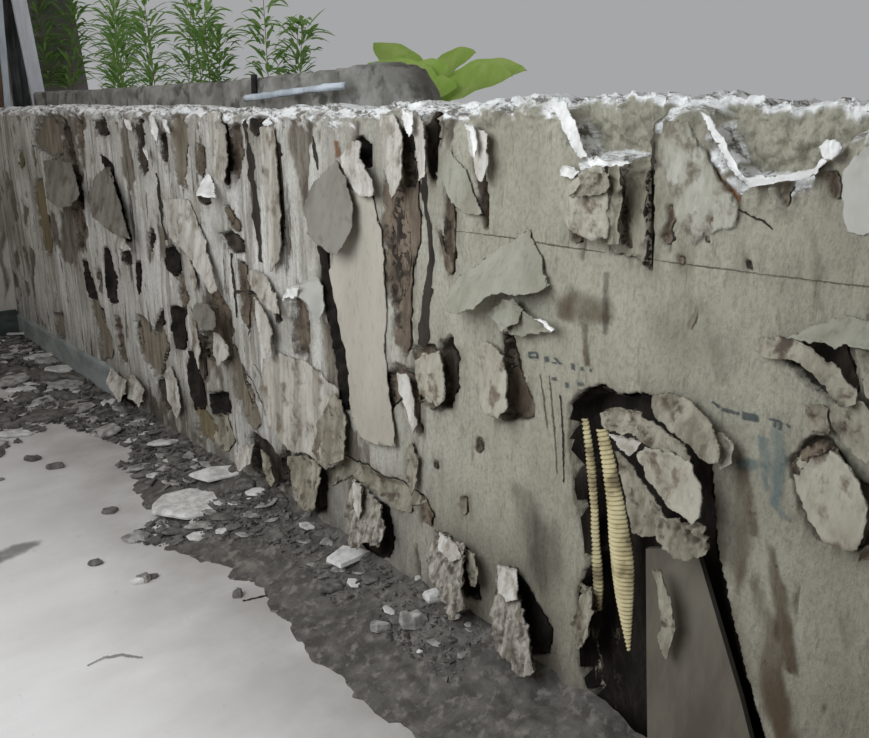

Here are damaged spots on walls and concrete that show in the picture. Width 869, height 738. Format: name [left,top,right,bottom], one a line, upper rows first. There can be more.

peeling [34,112,145,407]
peeling [124,109,555,622]
peeling [550,101,737,270]
peeling [700,111,869,235]
peeling [489,563,554,677]
spalling [569,386,766,738]